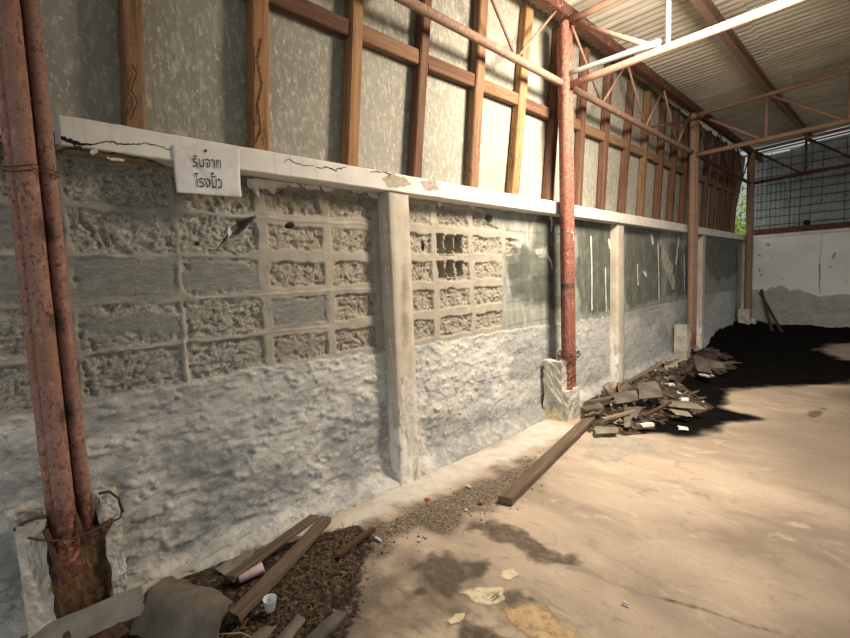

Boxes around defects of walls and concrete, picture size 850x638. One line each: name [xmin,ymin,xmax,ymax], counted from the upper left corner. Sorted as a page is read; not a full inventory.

crack [61,136,171,150]
peeling [194,178,379,213]
crack [283,159,345,171]
peeling [383,173,411,188]
peeling [421,178,439,191]
spalling [226,215,257,237]
damp [509,215,561,307]
damp [575,220,610,312]
peeling [400,375,418,438]
corrosion [47,508,113,619]